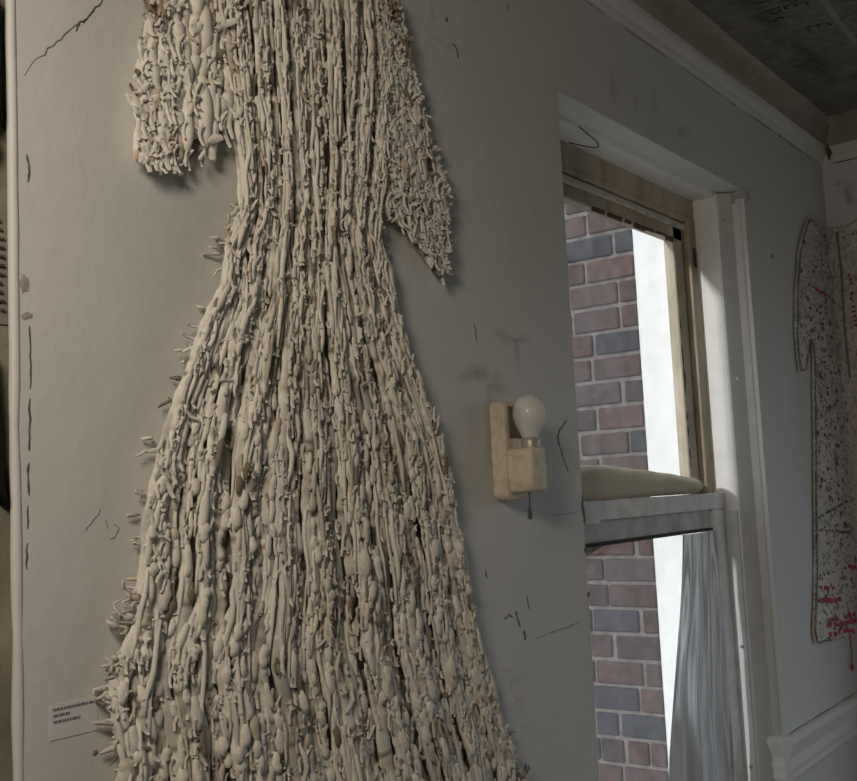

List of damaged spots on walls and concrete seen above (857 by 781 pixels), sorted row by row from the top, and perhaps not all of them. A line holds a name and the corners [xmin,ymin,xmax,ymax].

crack [24,0,103,75]